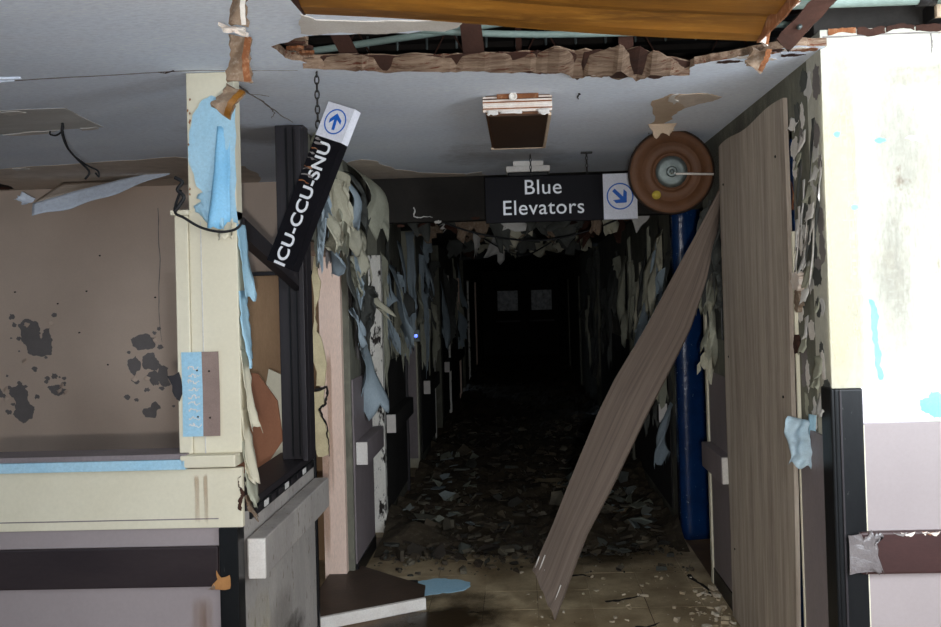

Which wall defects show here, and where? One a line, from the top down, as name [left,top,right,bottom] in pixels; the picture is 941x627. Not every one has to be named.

peeling [284,13,462,59]
peeling [648,93,721,139]
peeling [347,159,484,179]
peeling [0,95,263,507]
peeling [390,234,402,327]
spalling [311,225,331,457]
peeling [355,327,365,375]